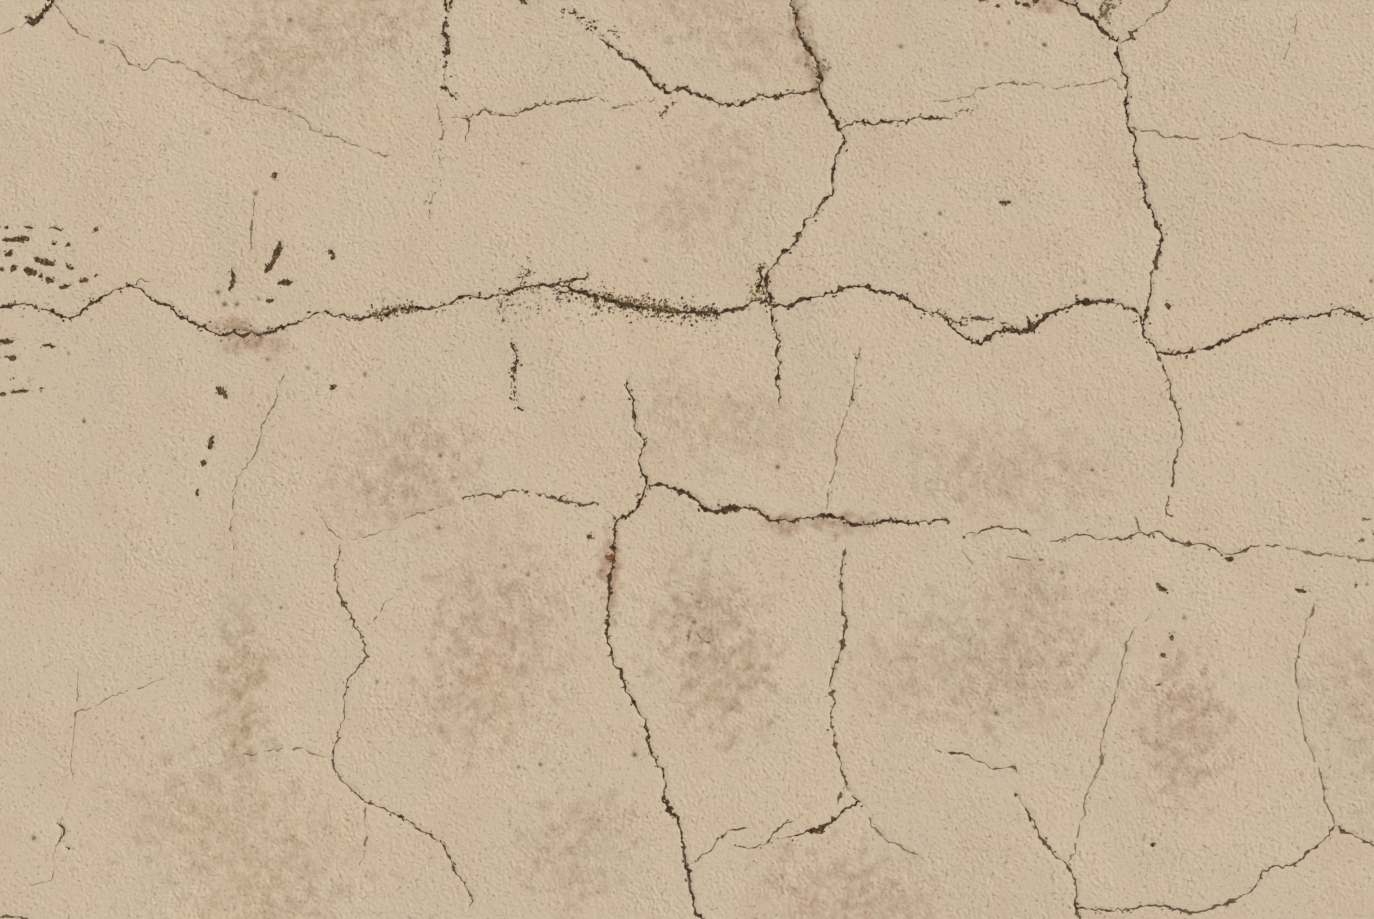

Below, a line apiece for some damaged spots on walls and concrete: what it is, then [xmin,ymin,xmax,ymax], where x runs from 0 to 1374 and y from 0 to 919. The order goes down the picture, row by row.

peeling [0,337,44,396]
peeling [0,225,98,290]
crack [0,0,1374,590]
crack [0,670,159,919]
crack [237,351,1031,919]
crack [936,605,1373,919]